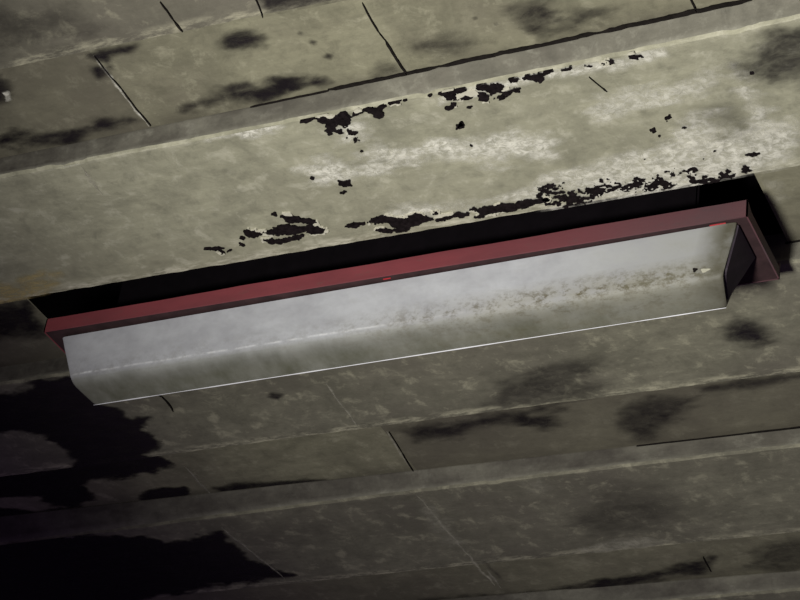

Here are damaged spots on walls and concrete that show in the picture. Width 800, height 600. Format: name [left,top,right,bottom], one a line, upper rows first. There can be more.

crack [160,1,183,32]
crack [94,56,151,126]
peeling [427,65,572,111]
crack [250,0,752,108]
peeling [584,57,615,68]
peeling [300,99,407,153]
peeling [337,179,352,195]
peeling [345,151,760,234]
peeling [204,212,329,256]
water stain [0,377,172,516]
water stain [140,487,189,500]
water stain [0,531,296,600]